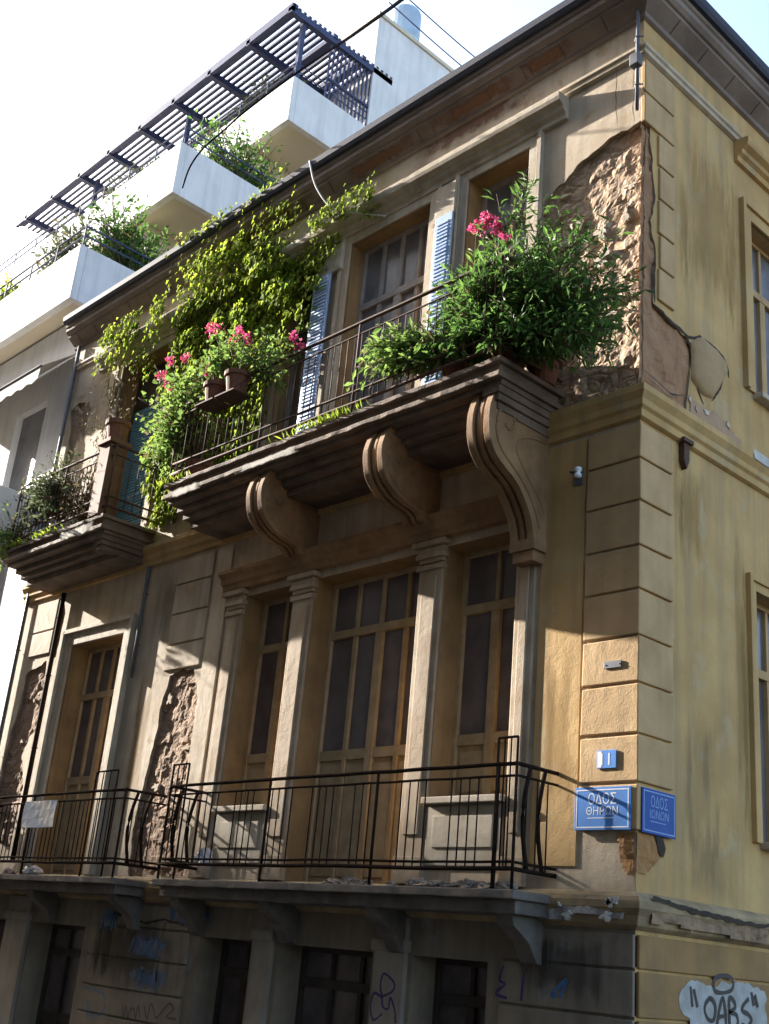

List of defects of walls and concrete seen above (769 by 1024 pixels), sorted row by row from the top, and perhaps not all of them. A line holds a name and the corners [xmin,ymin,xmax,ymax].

peeling [543,122,742,445]
peeling [0,609,65,849]
peeling [130,669,198,877]
spalling [541,896,624,922]
spalling [617,832,666,875]
spalling [651,896,769,944]